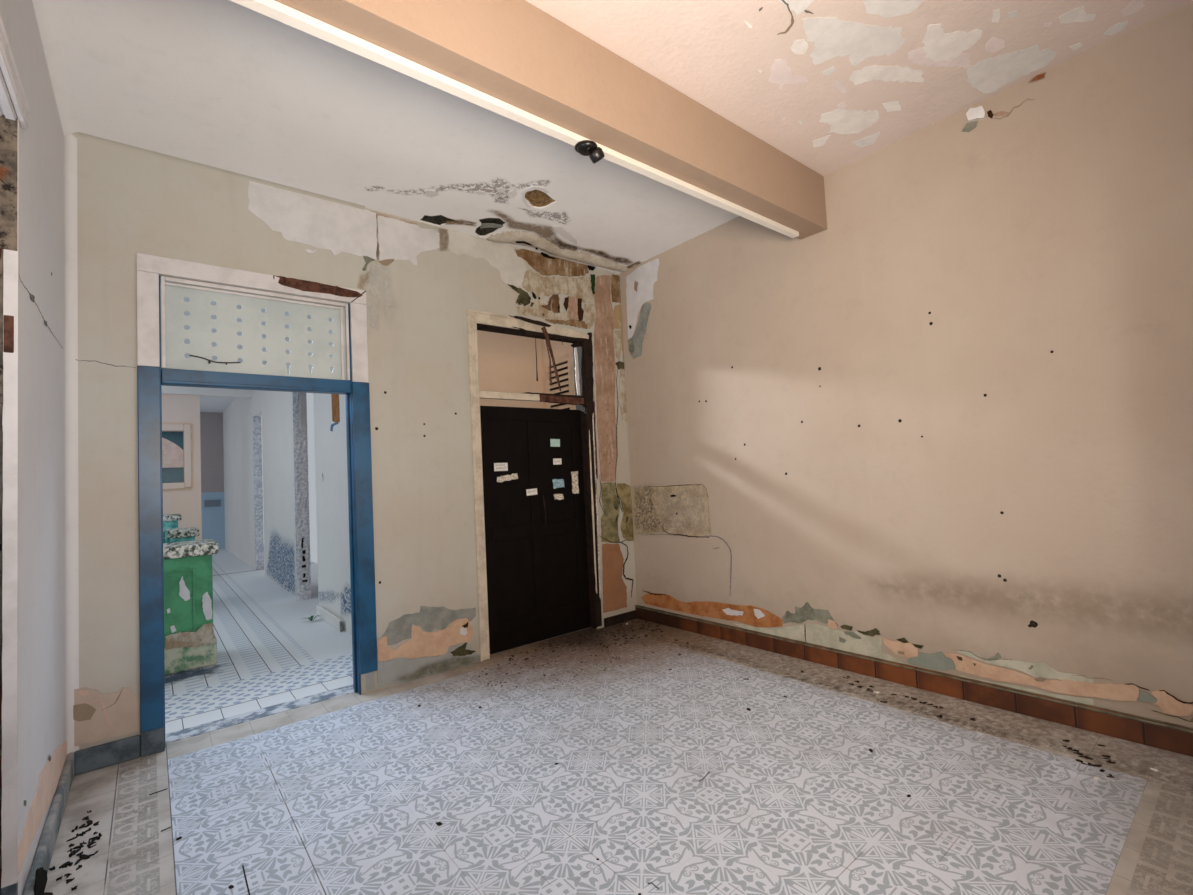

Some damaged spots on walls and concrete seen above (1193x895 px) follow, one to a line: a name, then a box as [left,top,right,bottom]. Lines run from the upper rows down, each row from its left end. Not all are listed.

crack [759,0,814,35]
peeling [758,0,1057,148]
crack [19,276,136,368]
peeling [248,181,659,482]
flaking render [602,543,627,613]
spalling [365,606,480,691]
spalling [641,591,1193,722]
spalling [18,687,140,875]